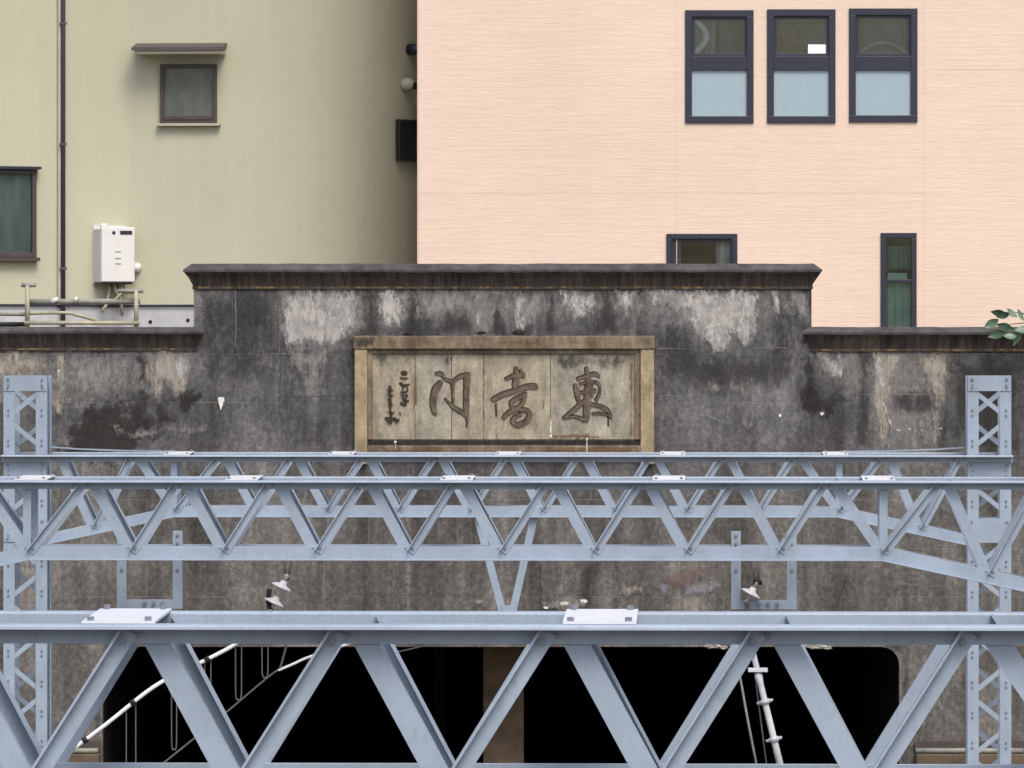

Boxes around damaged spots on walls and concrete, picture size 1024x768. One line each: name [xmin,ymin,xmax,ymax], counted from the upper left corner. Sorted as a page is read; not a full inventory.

leakage [282,289,809,395]
leakage [0,351,202,464]
leakage [801,354,947,447]